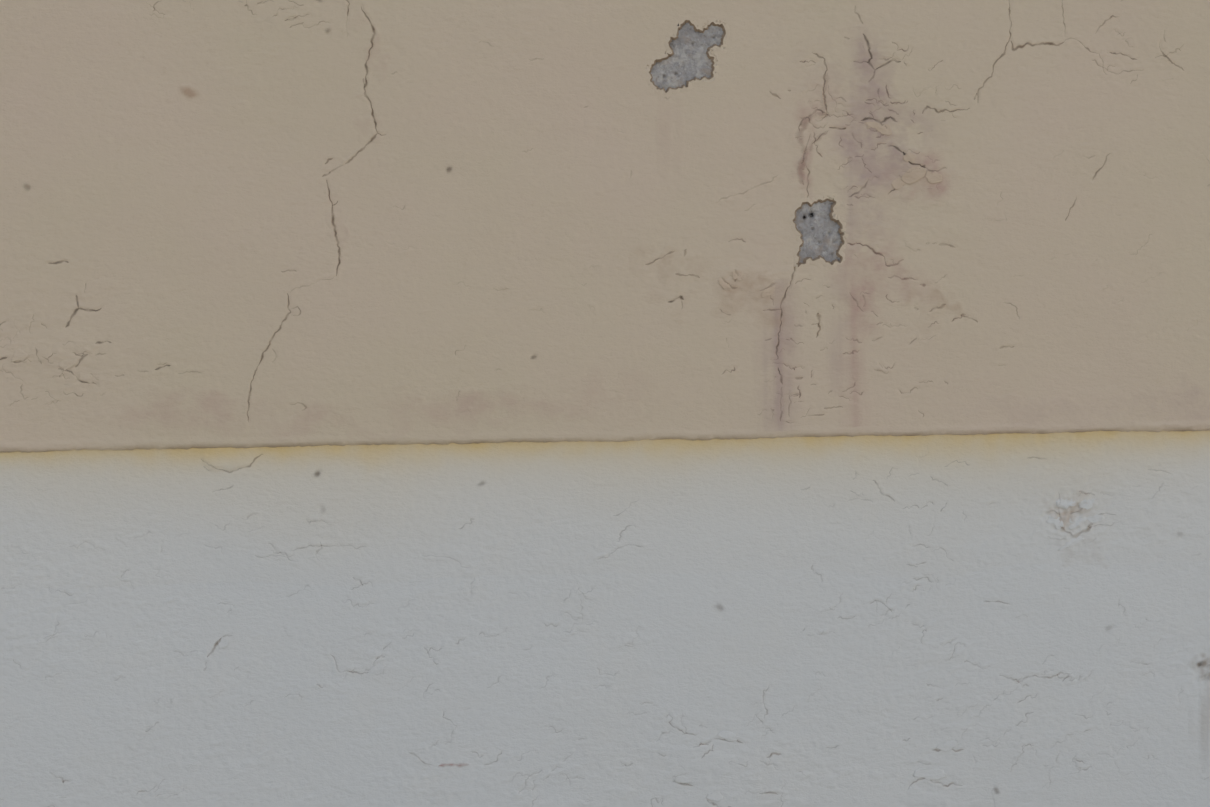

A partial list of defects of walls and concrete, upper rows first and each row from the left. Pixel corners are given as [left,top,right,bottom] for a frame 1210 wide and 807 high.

spalling [644,15,730,95]
crack [799,34,925,167]
water stain [0,0,1210,588]
spalling [788,195,849,272]